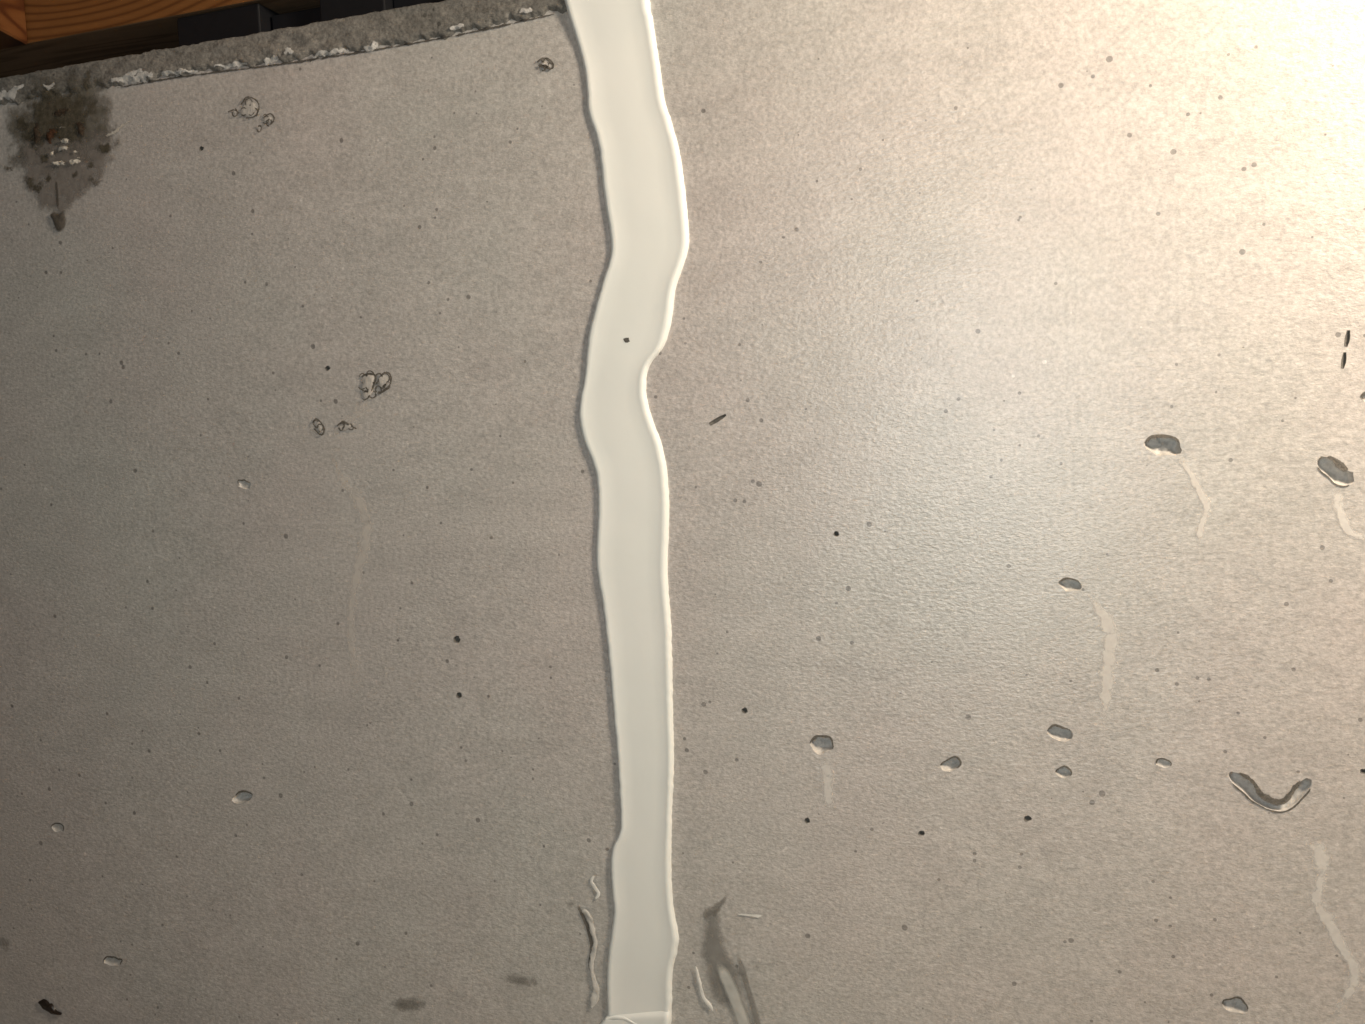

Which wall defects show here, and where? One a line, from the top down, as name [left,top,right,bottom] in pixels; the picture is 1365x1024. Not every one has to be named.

water stain [5,71,133,231]
water stain [718,960,760,1024]